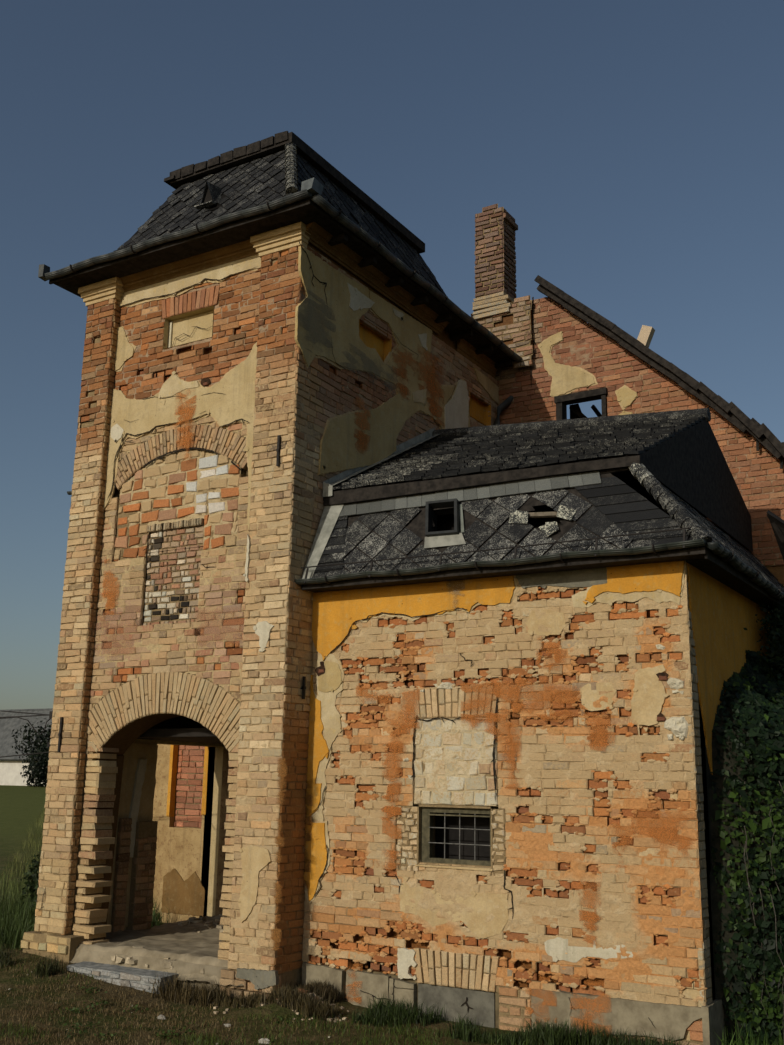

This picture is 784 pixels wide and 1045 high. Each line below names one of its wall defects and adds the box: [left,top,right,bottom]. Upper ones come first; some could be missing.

crack [120,266,258,307]
peeling [114,326,136,372]
peeling [119,246,499,475]
peeling [533,331,598,397]
peeling [615,385,638,415]
peeling [103,342,257,604]
spalling [196,641,243,670]
peeling [223,618,274,652]
peeling [303,560,695,903]
spalling [635,884,682,909]
spalling [308,920,633,997]
spalling [654,934,669,947]